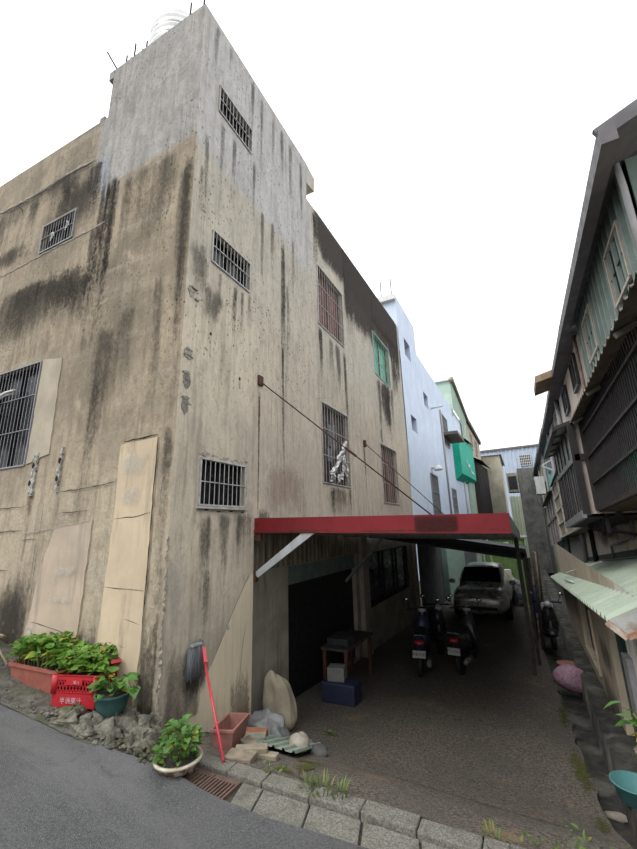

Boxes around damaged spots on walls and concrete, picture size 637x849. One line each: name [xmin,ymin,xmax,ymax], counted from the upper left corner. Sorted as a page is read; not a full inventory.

leakage [0,155,128,332]
leakage [177,163,205,290]
leakage [201,517,211,557]
leakage [0,590,24,647]